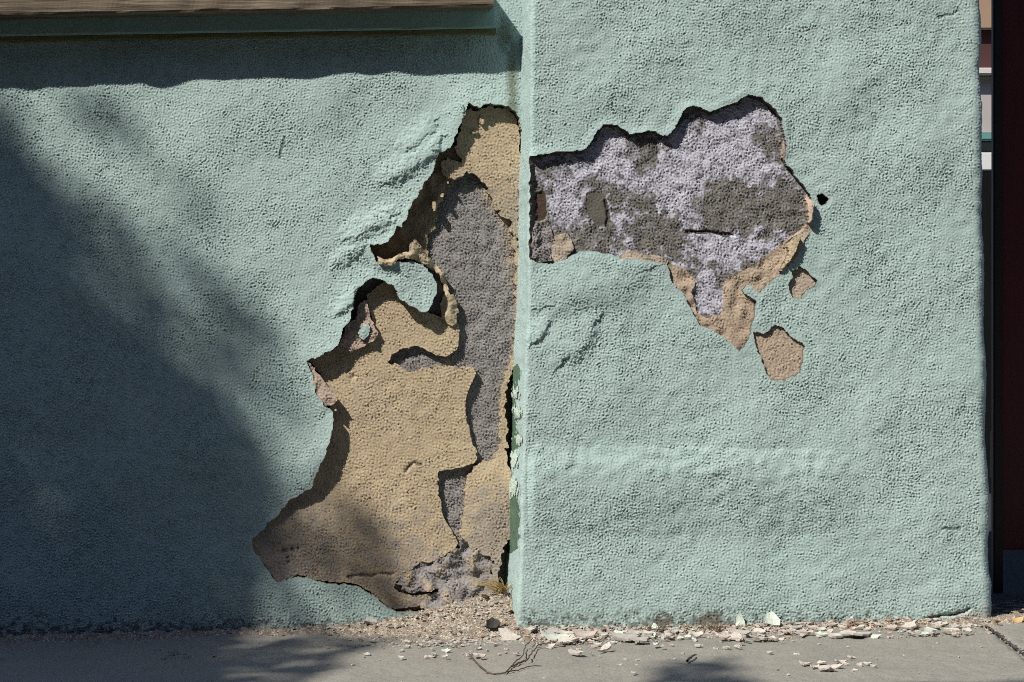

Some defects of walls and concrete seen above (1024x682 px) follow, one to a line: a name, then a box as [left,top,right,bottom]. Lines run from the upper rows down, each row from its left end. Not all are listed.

flaking render [252,96,826,614]